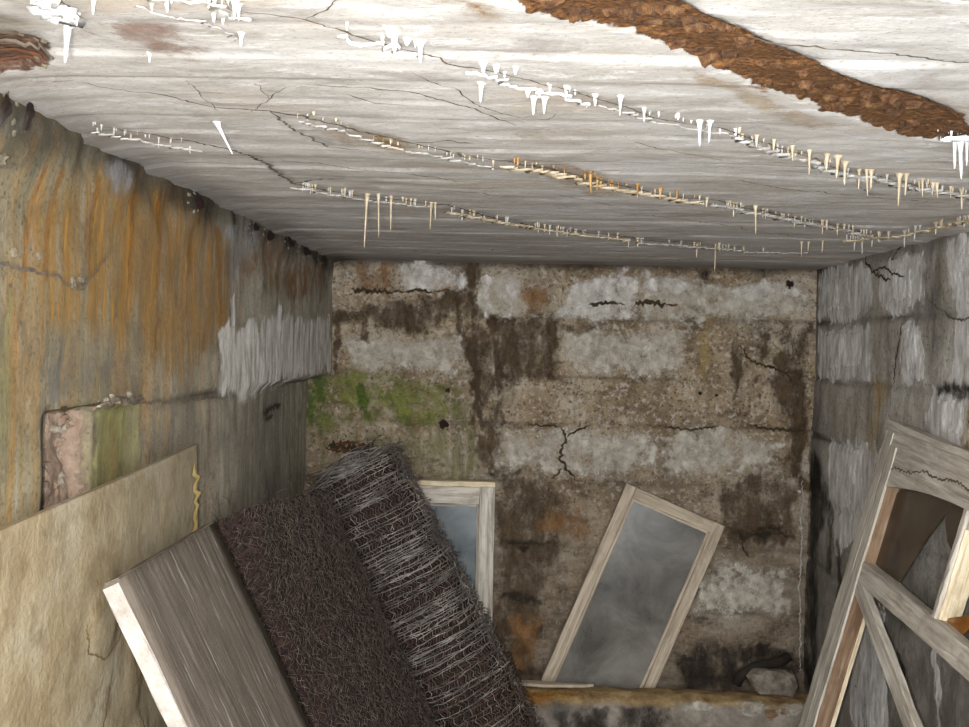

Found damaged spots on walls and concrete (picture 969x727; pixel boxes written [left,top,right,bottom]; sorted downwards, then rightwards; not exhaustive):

spalling [0,31,54,74]
damp [0,0,97,63]
rust [44,170,230,376]
damp [117,0,252,63]
crack [56,0,969,282]
damp [290,61,969,286]
damp [332,262,591,675]
crack [528,423,589,479]
damp [677,325,842,689]
damp [937,380,969,400]